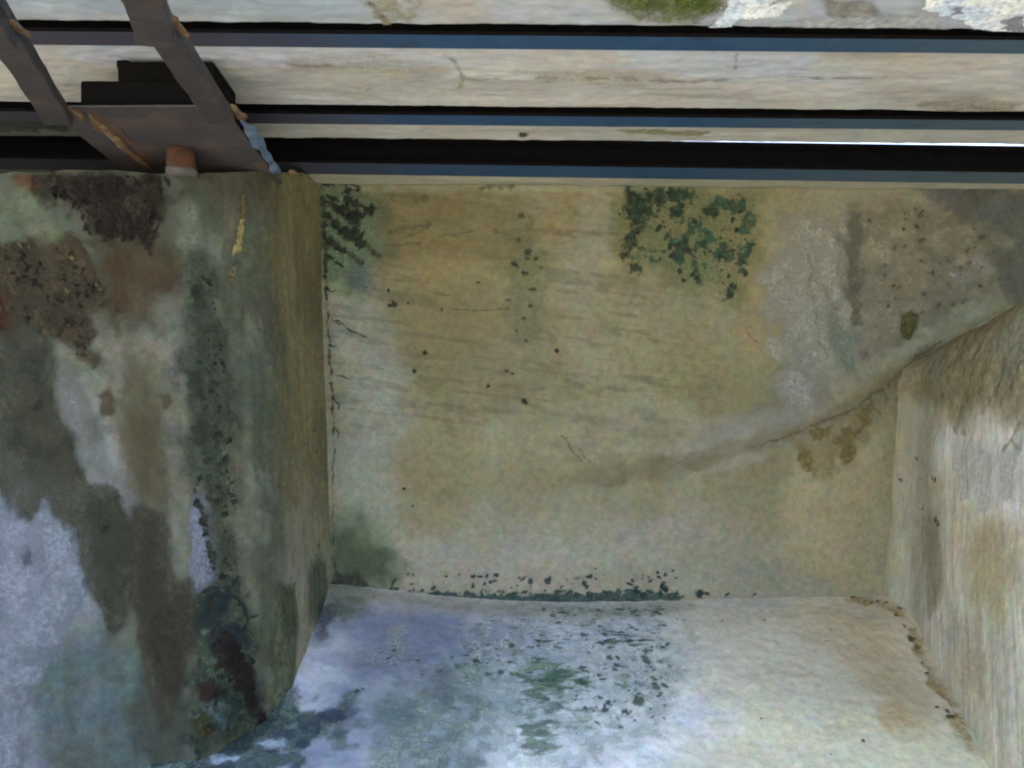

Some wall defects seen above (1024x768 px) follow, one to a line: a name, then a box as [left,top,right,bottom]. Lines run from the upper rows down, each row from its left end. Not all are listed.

mould [320,184,393,295]
mould [616,185,761,304]
water stain [0,199,365,768]
crack [320,185,367,573]
crack [750,341,941,447]
water stain [316,568,710,768]